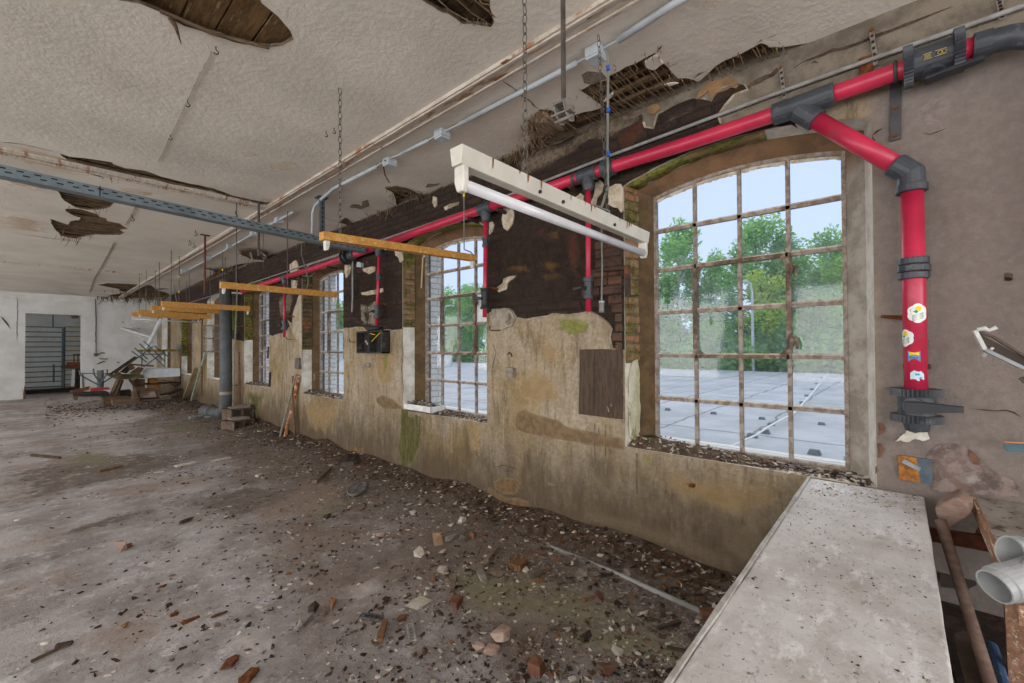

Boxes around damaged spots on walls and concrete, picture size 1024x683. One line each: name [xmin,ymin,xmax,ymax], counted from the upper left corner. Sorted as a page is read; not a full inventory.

spalling [121,0,293,50]
spalling [423,0,495,27]
flaking render [497,42,797,227]
spalling [50,191,128,245]
flaking render [97,175,641,440]
damp [401,409,421,467]
spalling [897,431,1021,498]